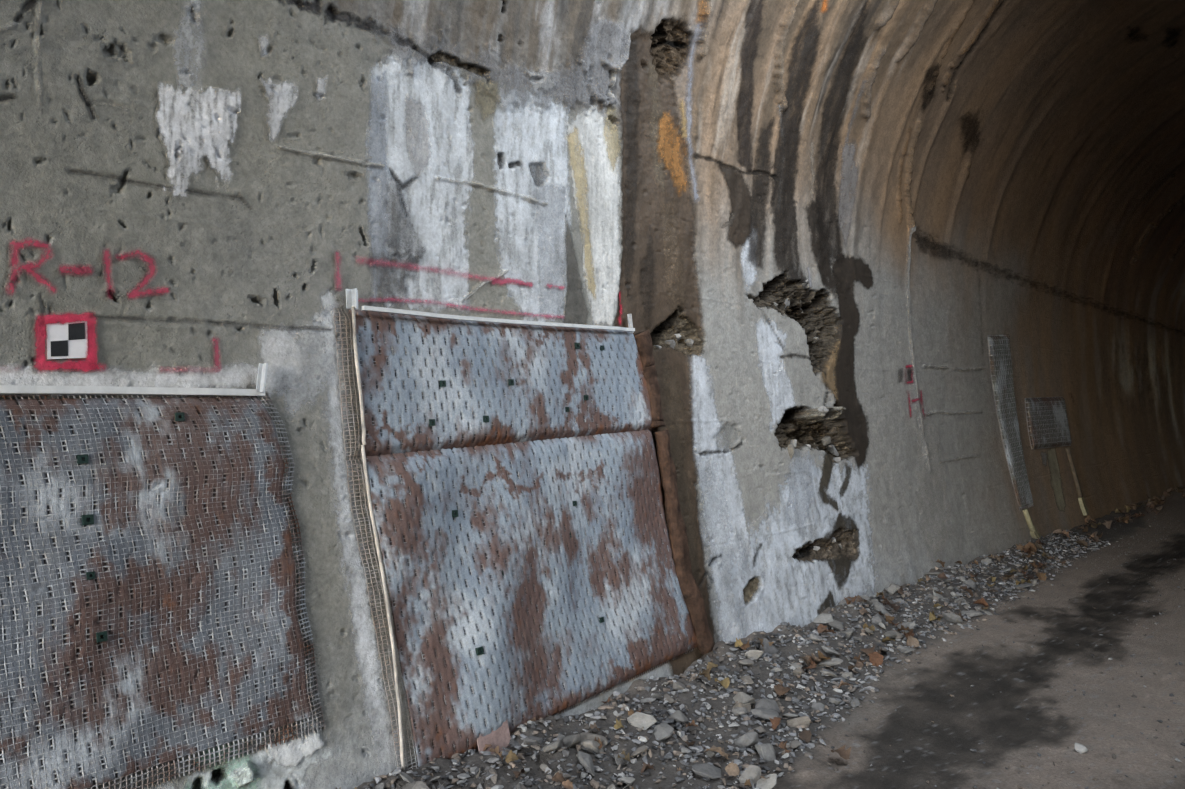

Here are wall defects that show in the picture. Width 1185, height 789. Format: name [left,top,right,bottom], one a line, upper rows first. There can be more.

crack [279,0,460,92]
rust [658,100,687,192]
crack [694,154,777,179]